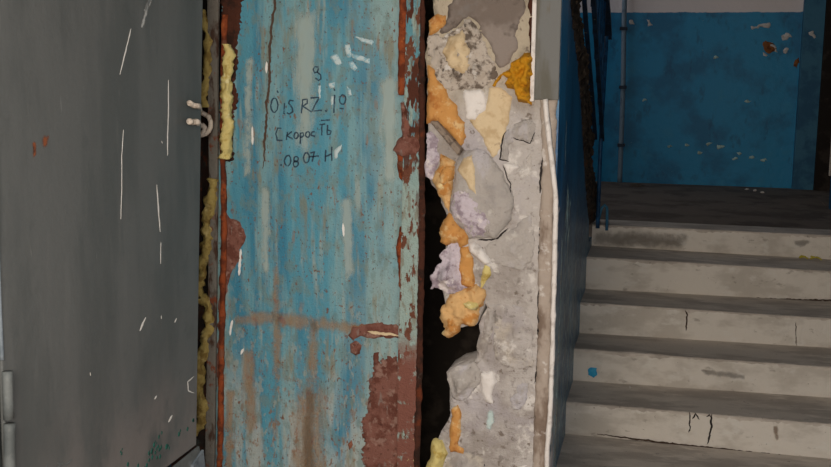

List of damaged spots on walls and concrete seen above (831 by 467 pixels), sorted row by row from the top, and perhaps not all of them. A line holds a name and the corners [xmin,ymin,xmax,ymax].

corrosion [220,0,244,122]
peeling [440,0,532,68]
spalling [762,33,792,56]
spalling [570,0,597,225]
corrosion [218,212,246,310]
corrosion [393,0,426,467]
corrosion [348,322,399,356]
corrosion [348,352,398,467]
crack [598,412,780,455]